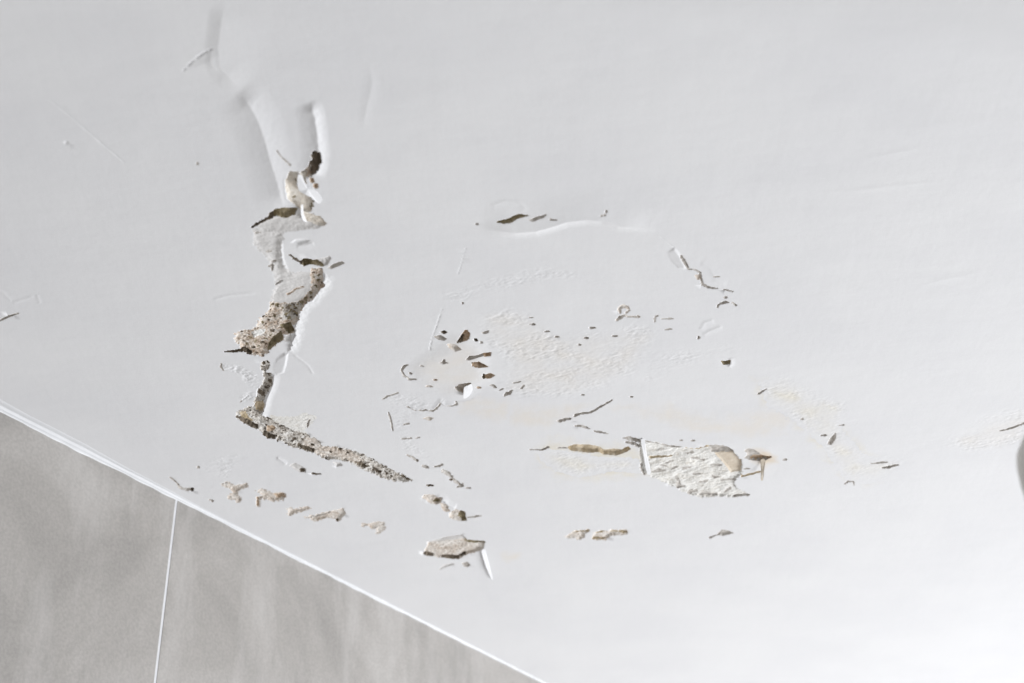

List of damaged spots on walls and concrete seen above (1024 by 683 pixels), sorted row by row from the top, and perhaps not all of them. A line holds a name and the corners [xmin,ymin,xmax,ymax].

flaking render [219,150,413,483]
peeling [386,392,482,521]
flaking render [529,436,771,498]
spalling [221,481,346,522]
spalling [361,521,386,534]
flaking render [423,534,493,580]
spalling [564,529,628,541]